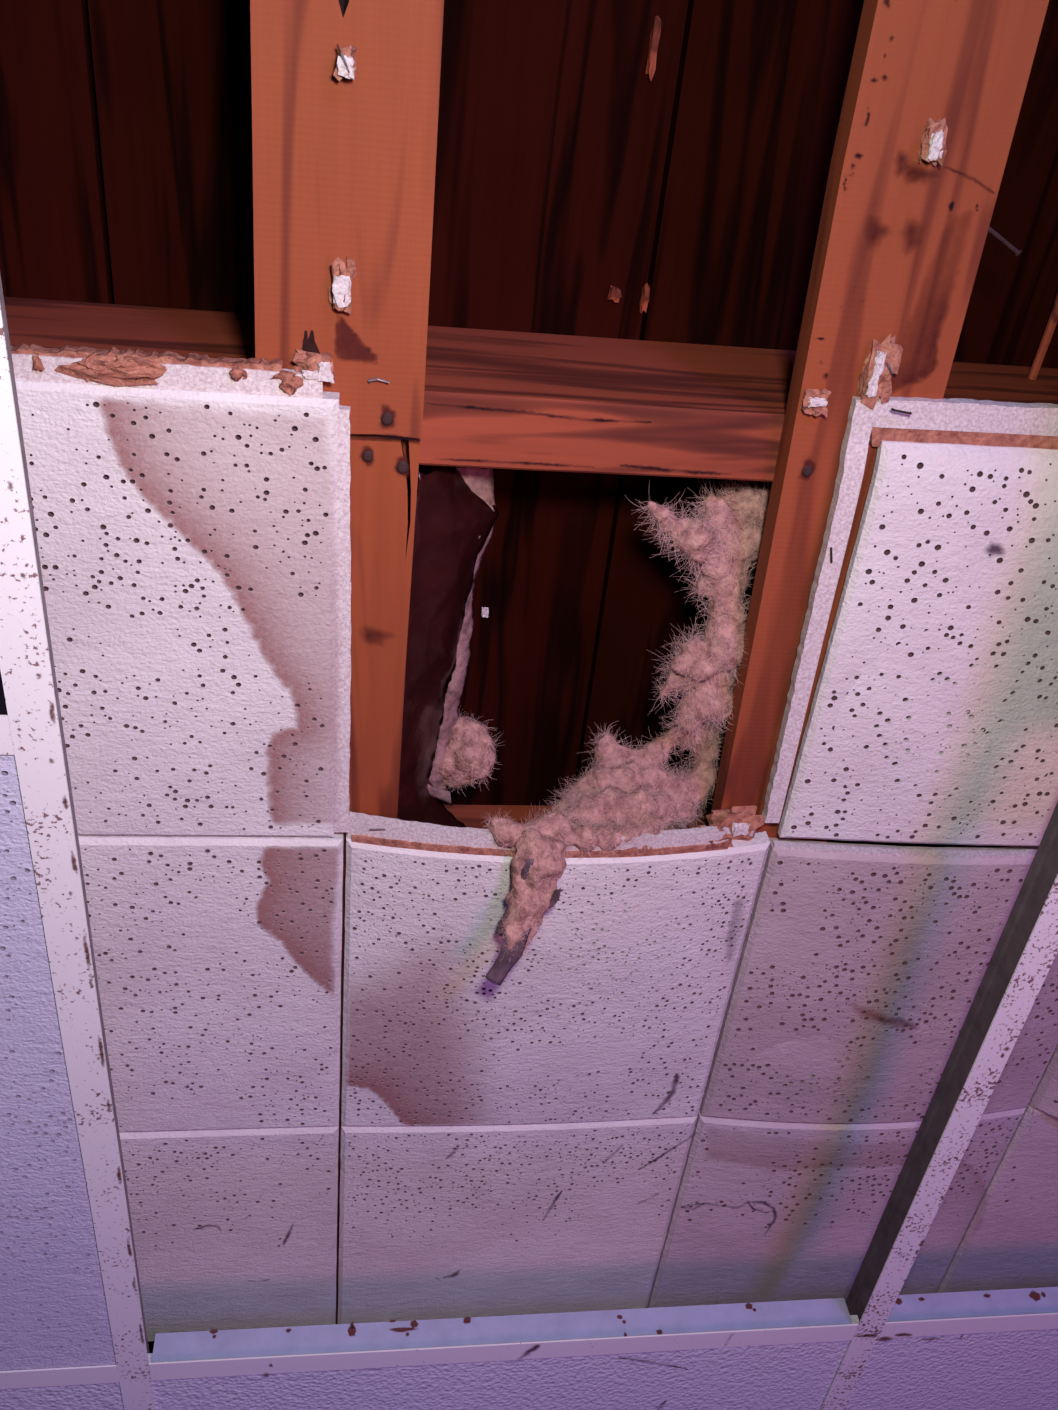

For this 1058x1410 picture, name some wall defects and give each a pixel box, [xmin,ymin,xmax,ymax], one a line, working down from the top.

water stain [103,402,317,822]
water stain [258,848,332,990]